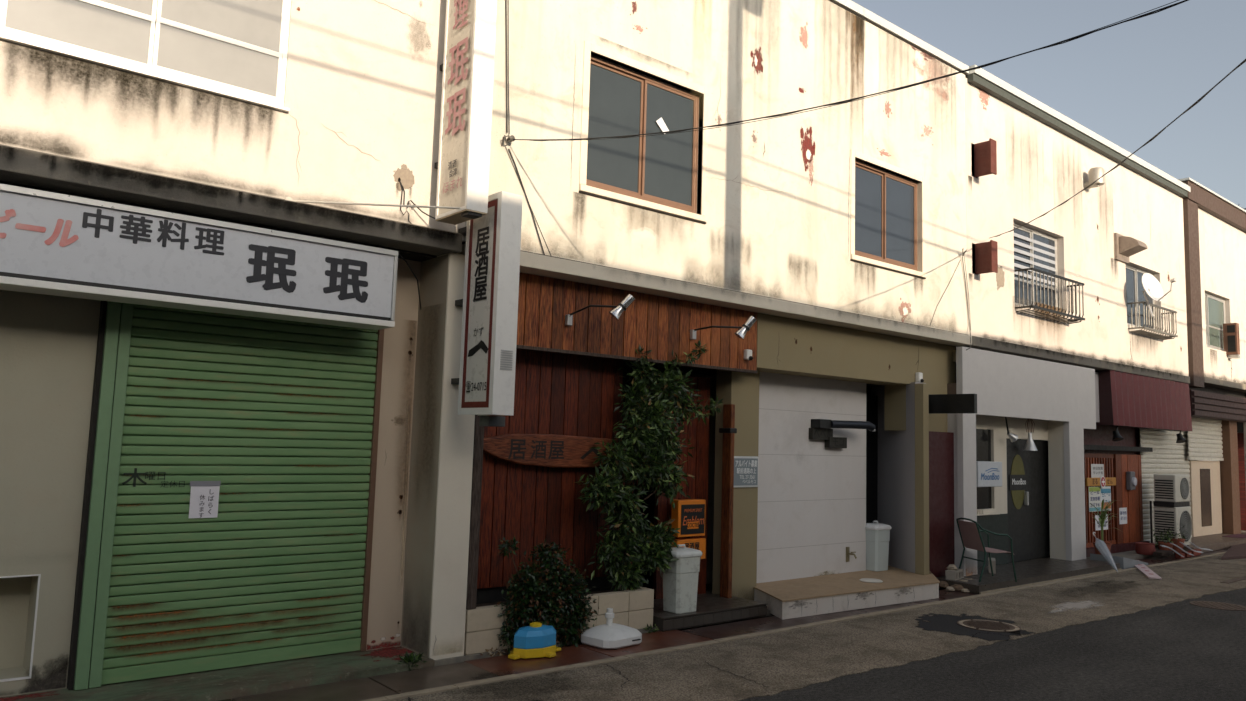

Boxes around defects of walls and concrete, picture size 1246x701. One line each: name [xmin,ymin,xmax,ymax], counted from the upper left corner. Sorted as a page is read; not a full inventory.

leakage [15,47,176,102]
peeling [751,47,763,73]
leakage [195,90,269,120]
crack [288,113,380,180]
peeling [800,127,815,171]
peeling [899,298,911,322]
corrosion [112,596,342,657]